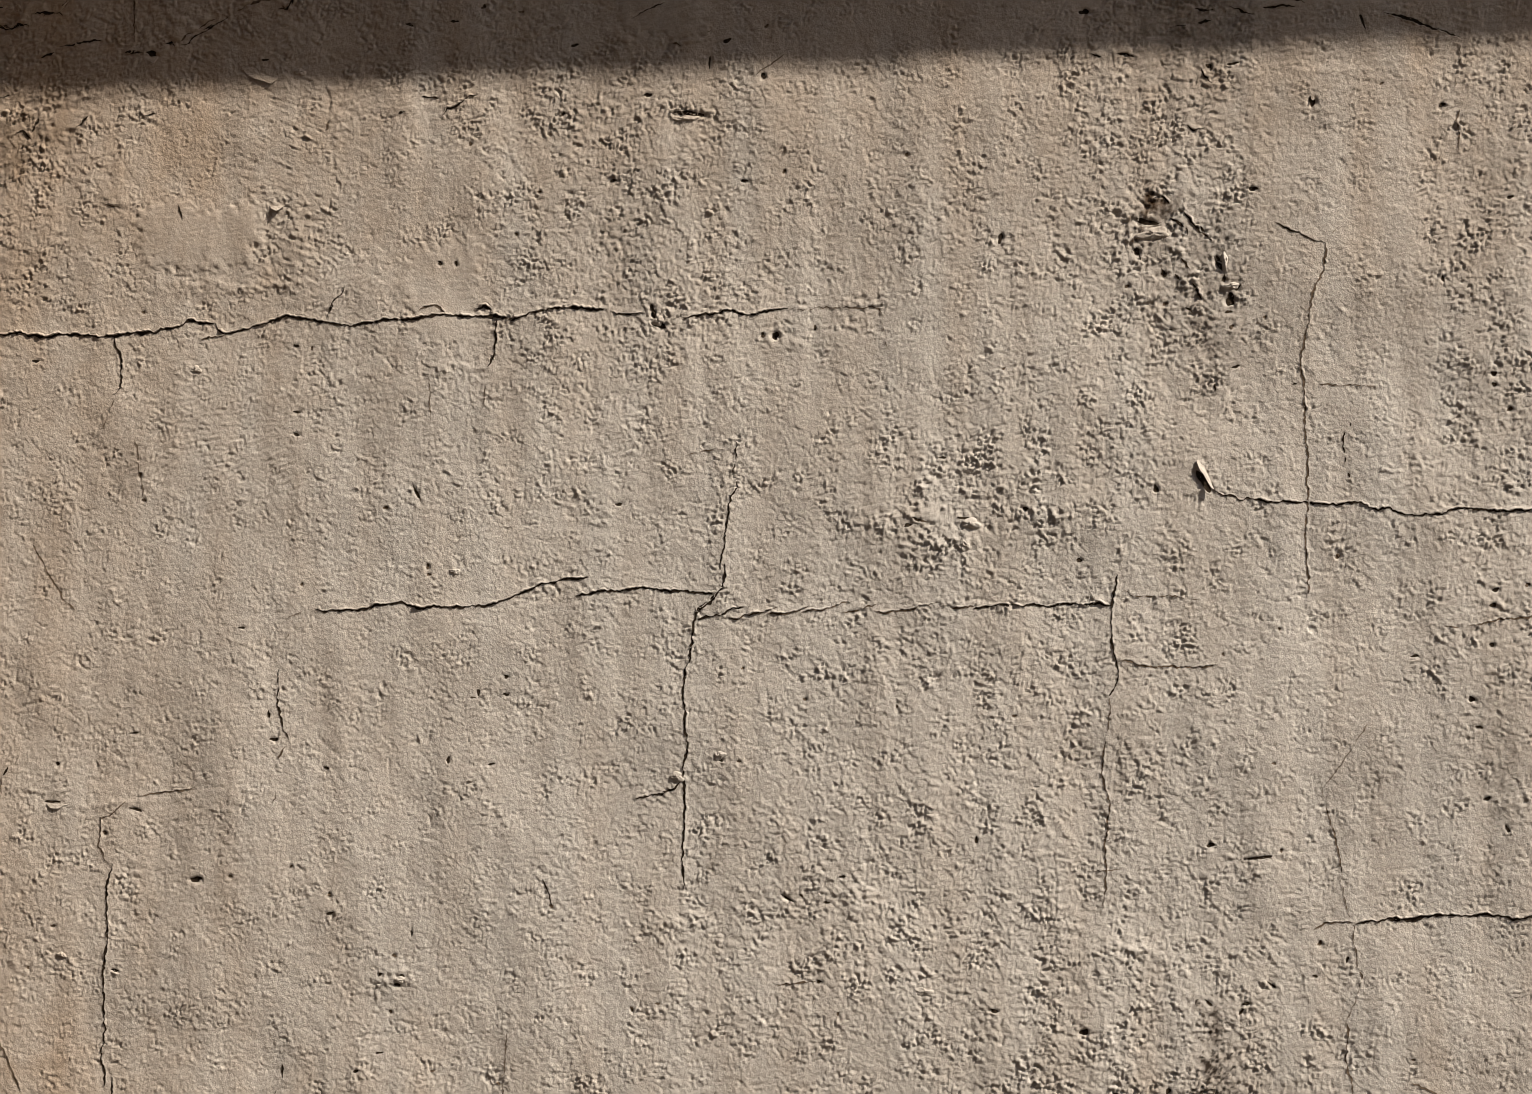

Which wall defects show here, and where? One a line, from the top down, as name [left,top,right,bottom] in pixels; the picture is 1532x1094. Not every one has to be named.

crack [0,287,644,495]
crack [684,306,887,346]
crack [1214,220,1532,594]
crack [33,545,75,610]
crack [276,441,1221,910]
crack [1445,614,1532,628]
crack [1313,725,1532,1094]